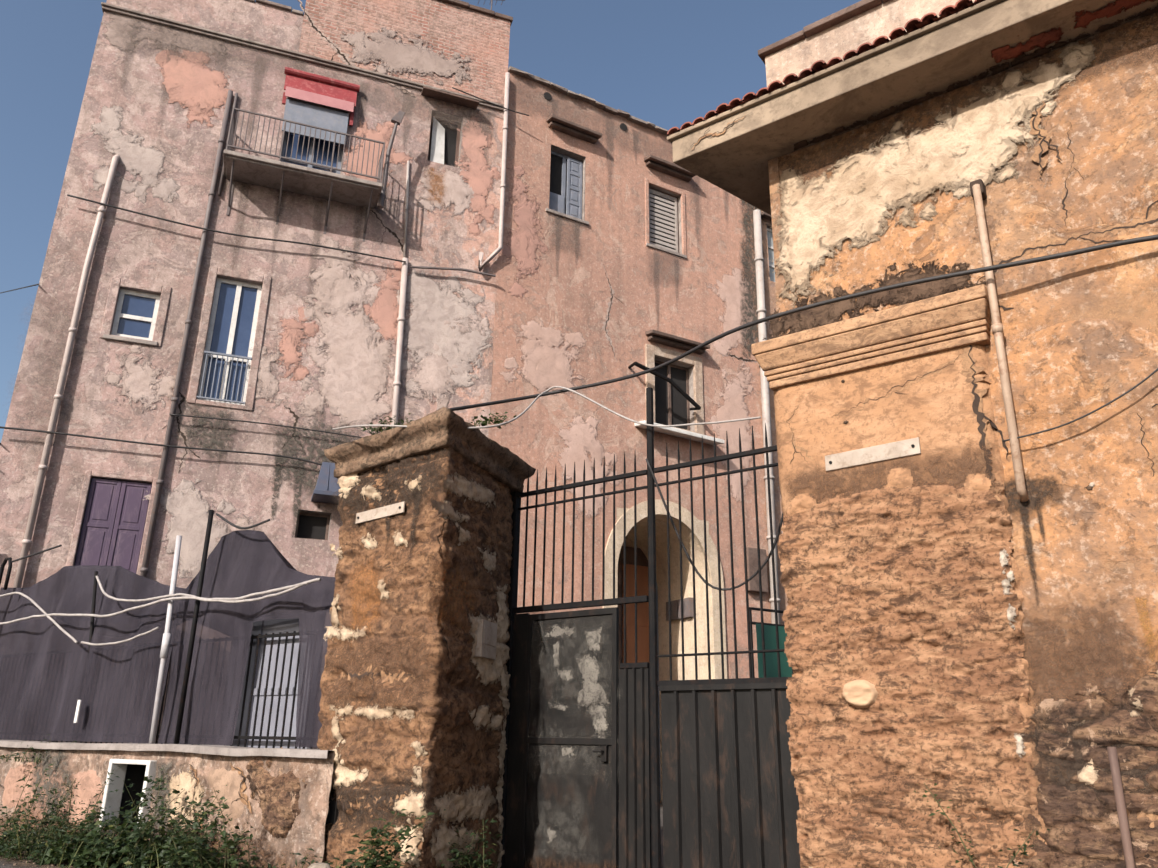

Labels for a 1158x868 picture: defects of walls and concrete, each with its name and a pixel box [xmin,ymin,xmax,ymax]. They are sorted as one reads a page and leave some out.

flaking render [101,12,235,128]
crack [298,0,415,96]
flaking render [336,117,413,187]
flaking render [417,116,553,298]
crack [969,101,1158,311]
flaking render [705,41,1097,502]
flaking render [246,238,586,433]
crack [162,391,201,474]
mould [271,416,356,534]
crack [832,344,1008,501]
crack [1137,404,1158,476]
flaking render [164,747,307,839]